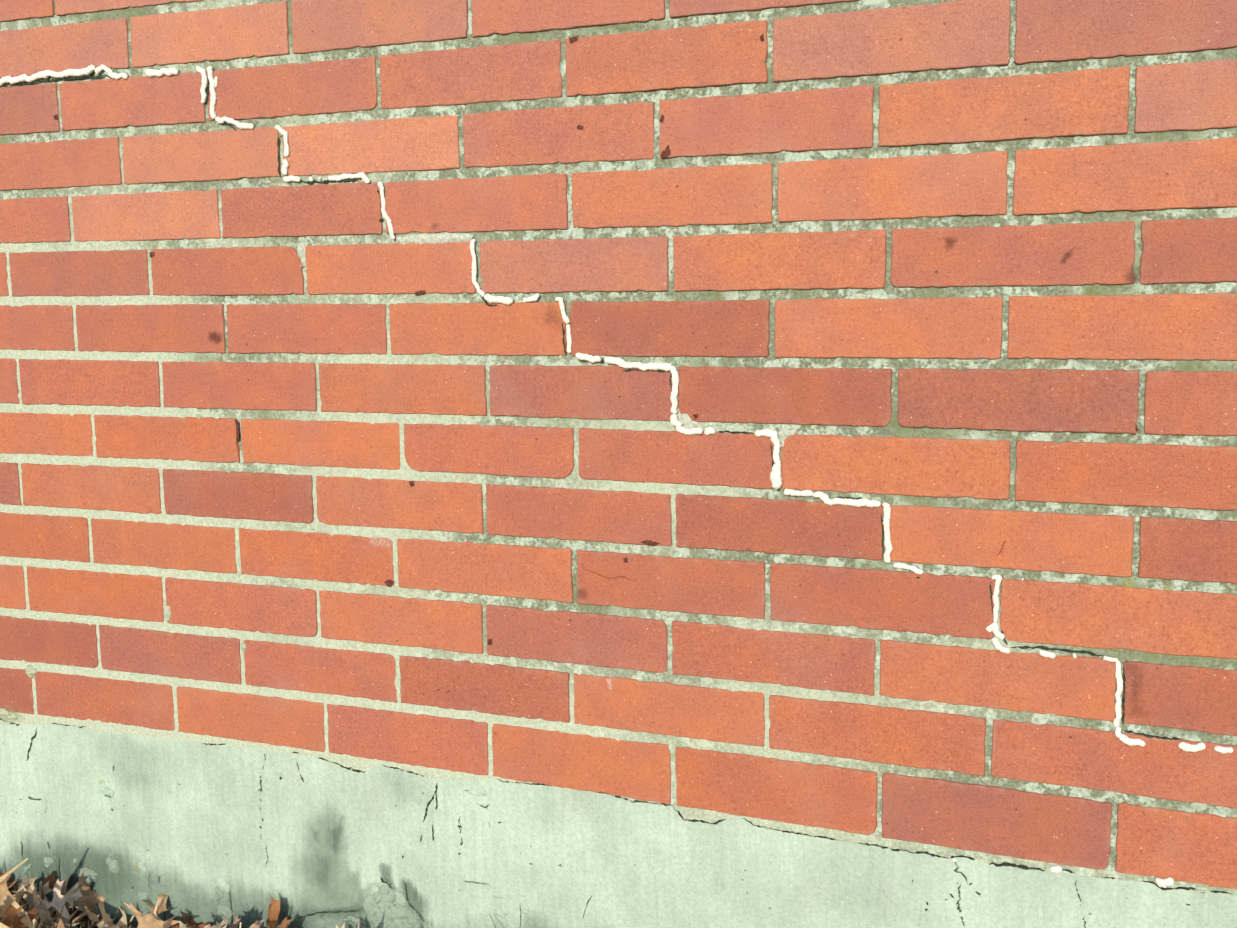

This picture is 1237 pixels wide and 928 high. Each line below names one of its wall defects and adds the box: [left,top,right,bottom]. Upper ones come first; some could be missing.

crack [0,64,923,579]
crack [986,540,1234,754]
crack [0,718,85,761]
crack [256,752,490,867]
water stain [382,869,424,923]
crack [597,792,1230,928]